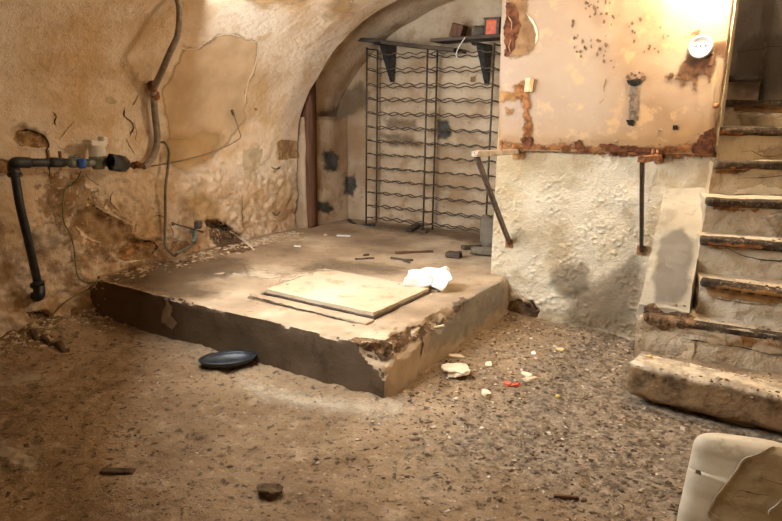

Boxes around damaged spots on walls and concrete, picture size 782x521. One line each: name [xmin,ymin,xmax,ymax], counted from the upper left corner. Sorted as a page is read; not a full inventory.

rust [503,0,538,57]
rust [665,40,729,90]
flaking render [162,33,258,158]
spalling [13,129,49,152]
leakage [437,120,452,139]
rust [499,79,745,164]
flaking render [242,148,263,184]
leakage [323,151,339,172]
leakage [344,176,357,196]
rust [716,166,761,175]
spalling [348,297,468,361]
crack [687,339,782,356]